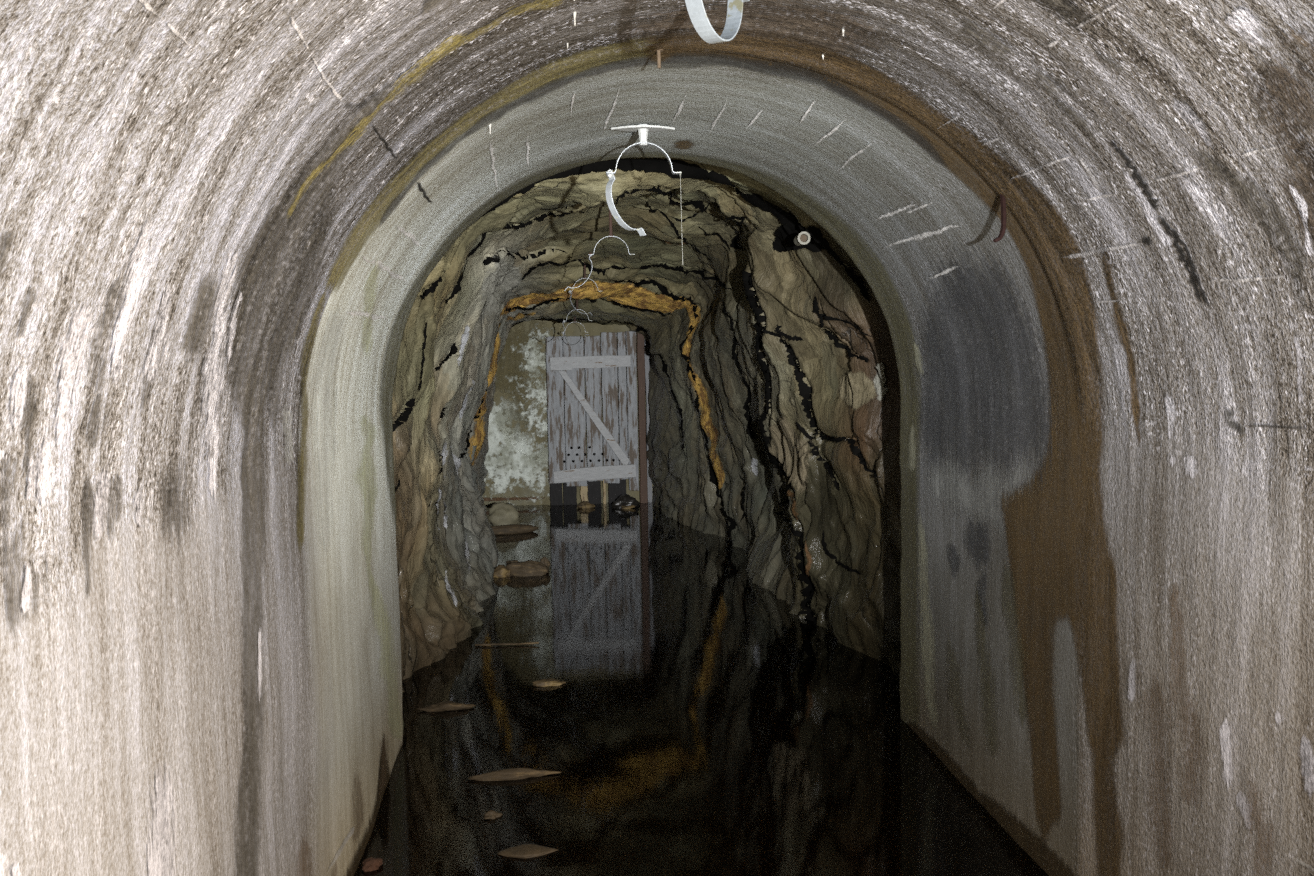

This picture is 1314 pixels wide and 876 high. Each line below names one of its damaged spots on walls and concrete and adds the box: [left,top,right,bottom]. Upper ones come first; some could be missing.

damp [142,0,886,876]
rust [647,27,1124,876]
rust [1102,251,1140,440]
damp [1295,340,1303,404]